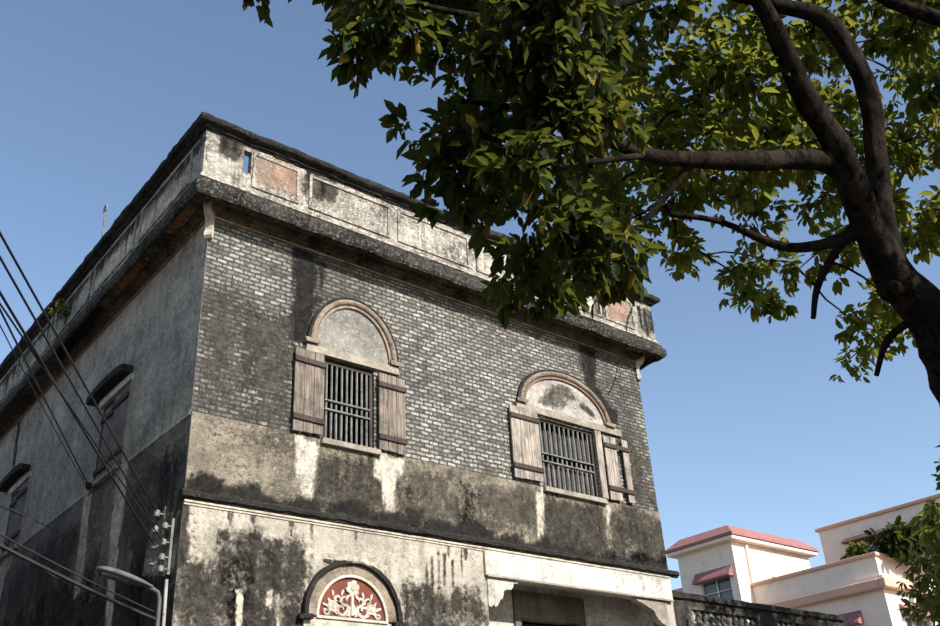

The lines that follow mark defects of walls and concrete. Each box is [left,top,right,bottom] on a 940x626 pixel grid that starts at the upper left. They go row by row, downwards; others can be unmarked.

leakage [0,247,668,626]